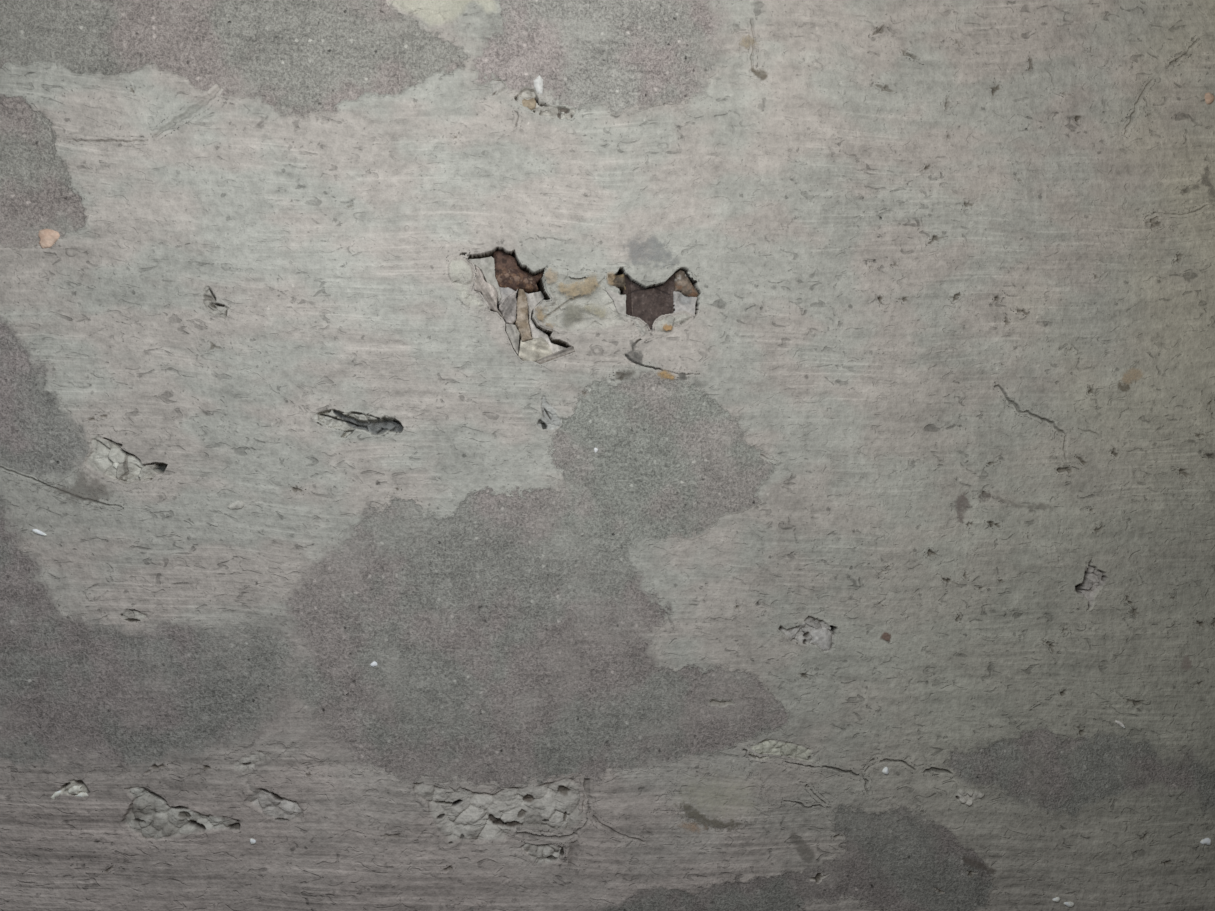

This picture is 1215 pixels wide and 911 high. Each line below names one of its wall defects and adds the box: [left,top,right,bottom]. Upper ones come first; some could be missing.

rust [493,250,626,327]
spalling [465,244,704,366]
rust [674,270,699,297]
crack [992,381,1102,464]
peeling [0,310,790,789]
peeling [940,723,1215,823]